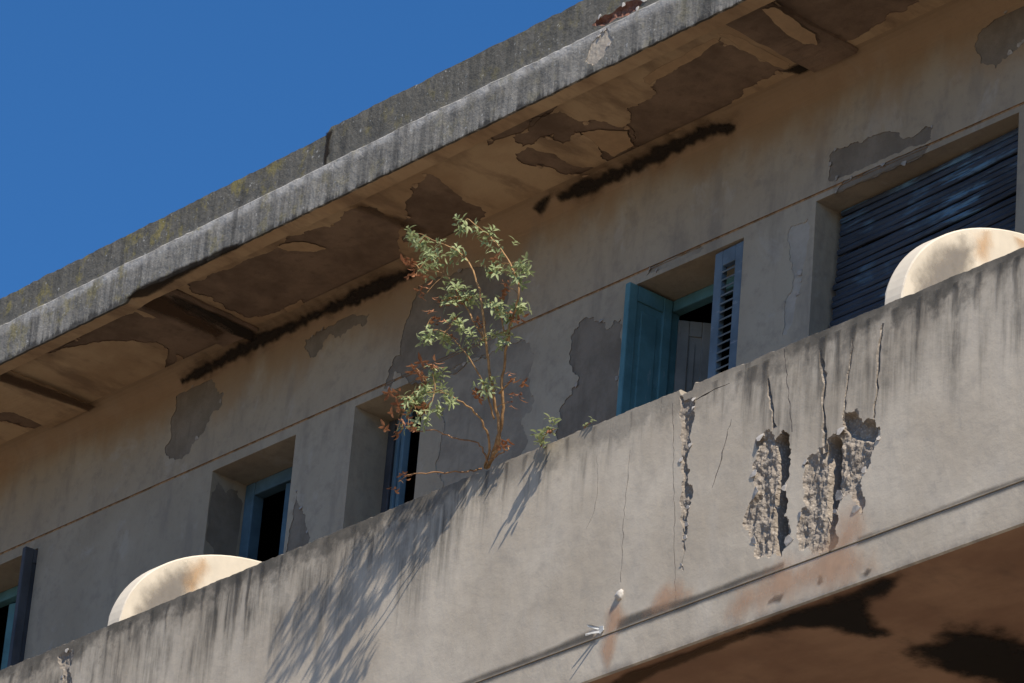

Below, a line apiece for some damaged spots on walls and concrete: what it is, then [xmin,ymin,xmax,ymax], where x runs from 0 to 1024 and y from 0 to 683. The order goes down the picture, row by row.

spalling [586,0,647,65]
leakage [534,124,735,214]
flaking render [487,38,786,178]
peeling [828,125,933,194]
flaking render [188,173,486,318]
peeling [165,379,224,460]
leakage [126,244,416,384]
peeling [555,317,622,440]
crack [672,383,731,608]
crack [767,349,793,432]
spalling [742,408,881,559]
crack [819,323,884,454]